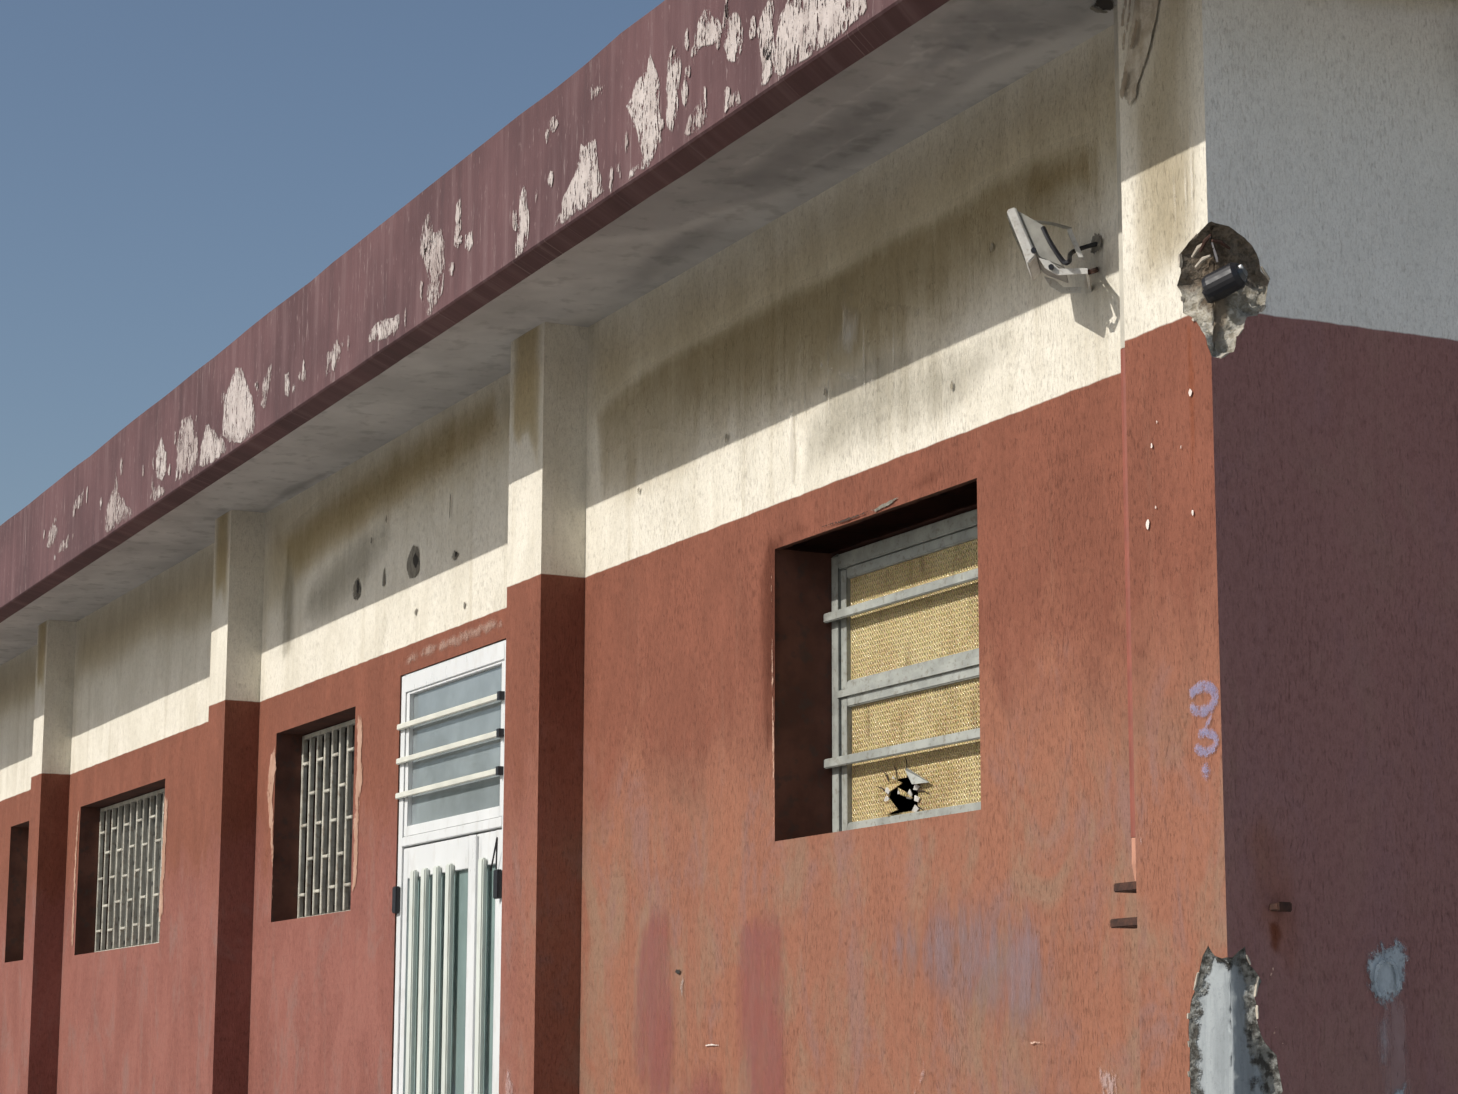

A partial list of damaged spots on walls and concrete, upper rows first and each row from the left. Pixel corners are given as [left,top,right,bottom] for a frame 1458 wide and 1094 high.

peeling [512,0,866,258]
peeling [326,340,348,374]
peeling [369,198,473,342]
spalling [1177,222,1270,359]
peeling [142,360,306,500]
peeling [43,460,131,560]
spalling [353,578,361,600]
spalling [407,545,419,579]
spalling [1187,946,1283,1094]